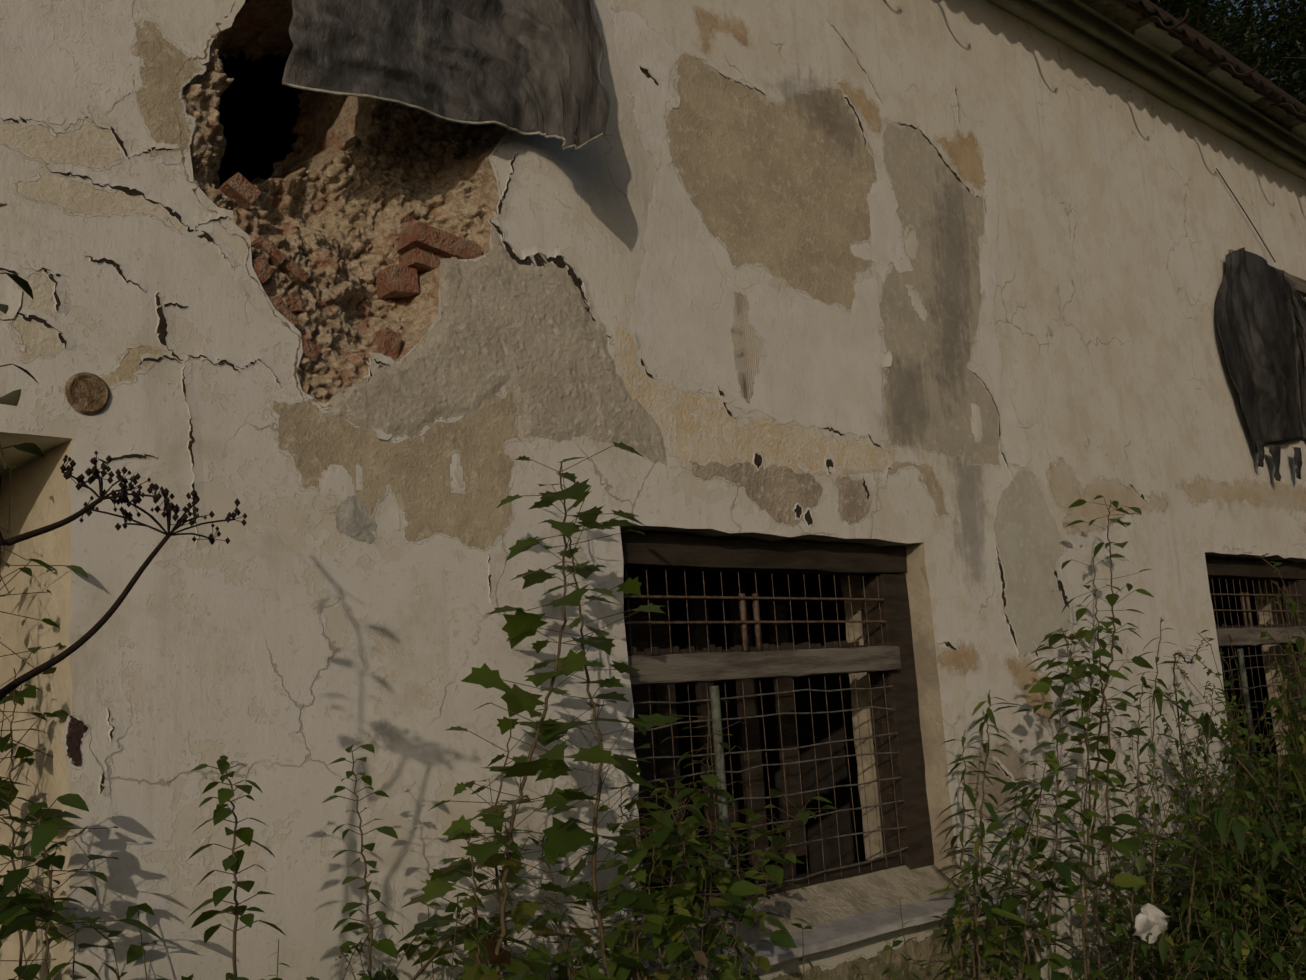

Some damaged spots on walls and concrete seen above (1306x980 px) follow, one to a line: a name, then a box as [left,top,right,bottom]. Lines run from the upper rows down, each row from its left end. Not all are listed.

crack [0,113,239,268]
crack [0,247,288,548]
spalling [0,0,1071,658]
flaking render [61,715,89,770]
crack [95,704,125,797]